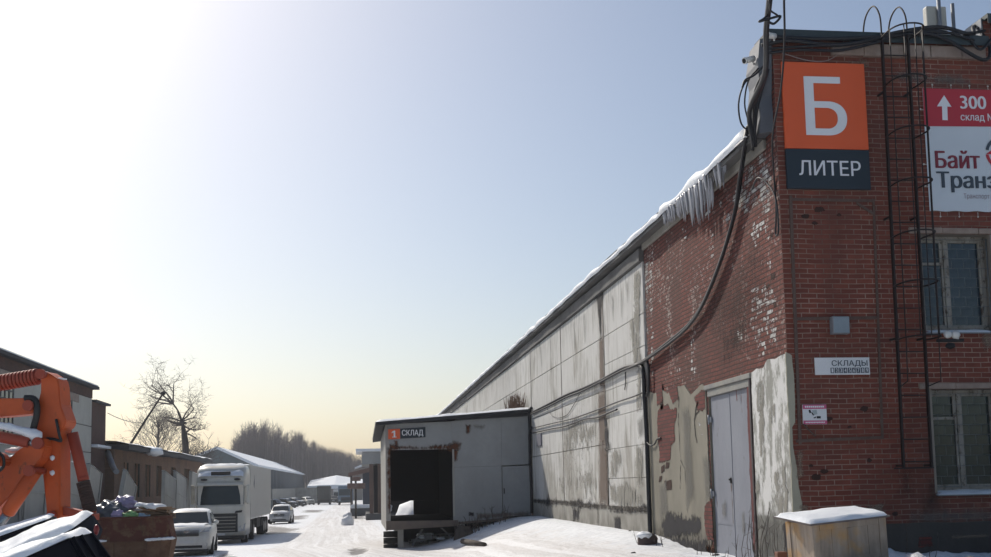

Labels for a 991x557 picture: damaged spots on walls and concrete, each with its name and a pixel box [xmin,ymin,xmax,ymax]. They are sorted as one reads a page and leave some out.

water stain [705,153,771,246]
water stain [596,292,613,504]
flaking render [694,390,705,411]
corrosion [387,441,461,513]
flaking render [704,501,713,552]